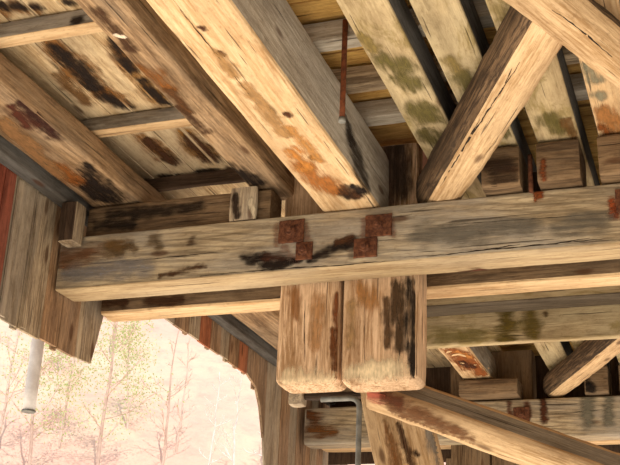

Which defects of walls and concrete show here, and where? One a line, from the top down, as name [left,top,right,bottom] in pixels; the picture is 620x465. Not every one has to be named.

damp [42,39,135,110]
mould [356,32,422,94]
crack [552,10,612,57]
mould [406,100,445,145]
crack [440,62,520,186]
mould [538,112,577,139]
damp [347,276,417,378]